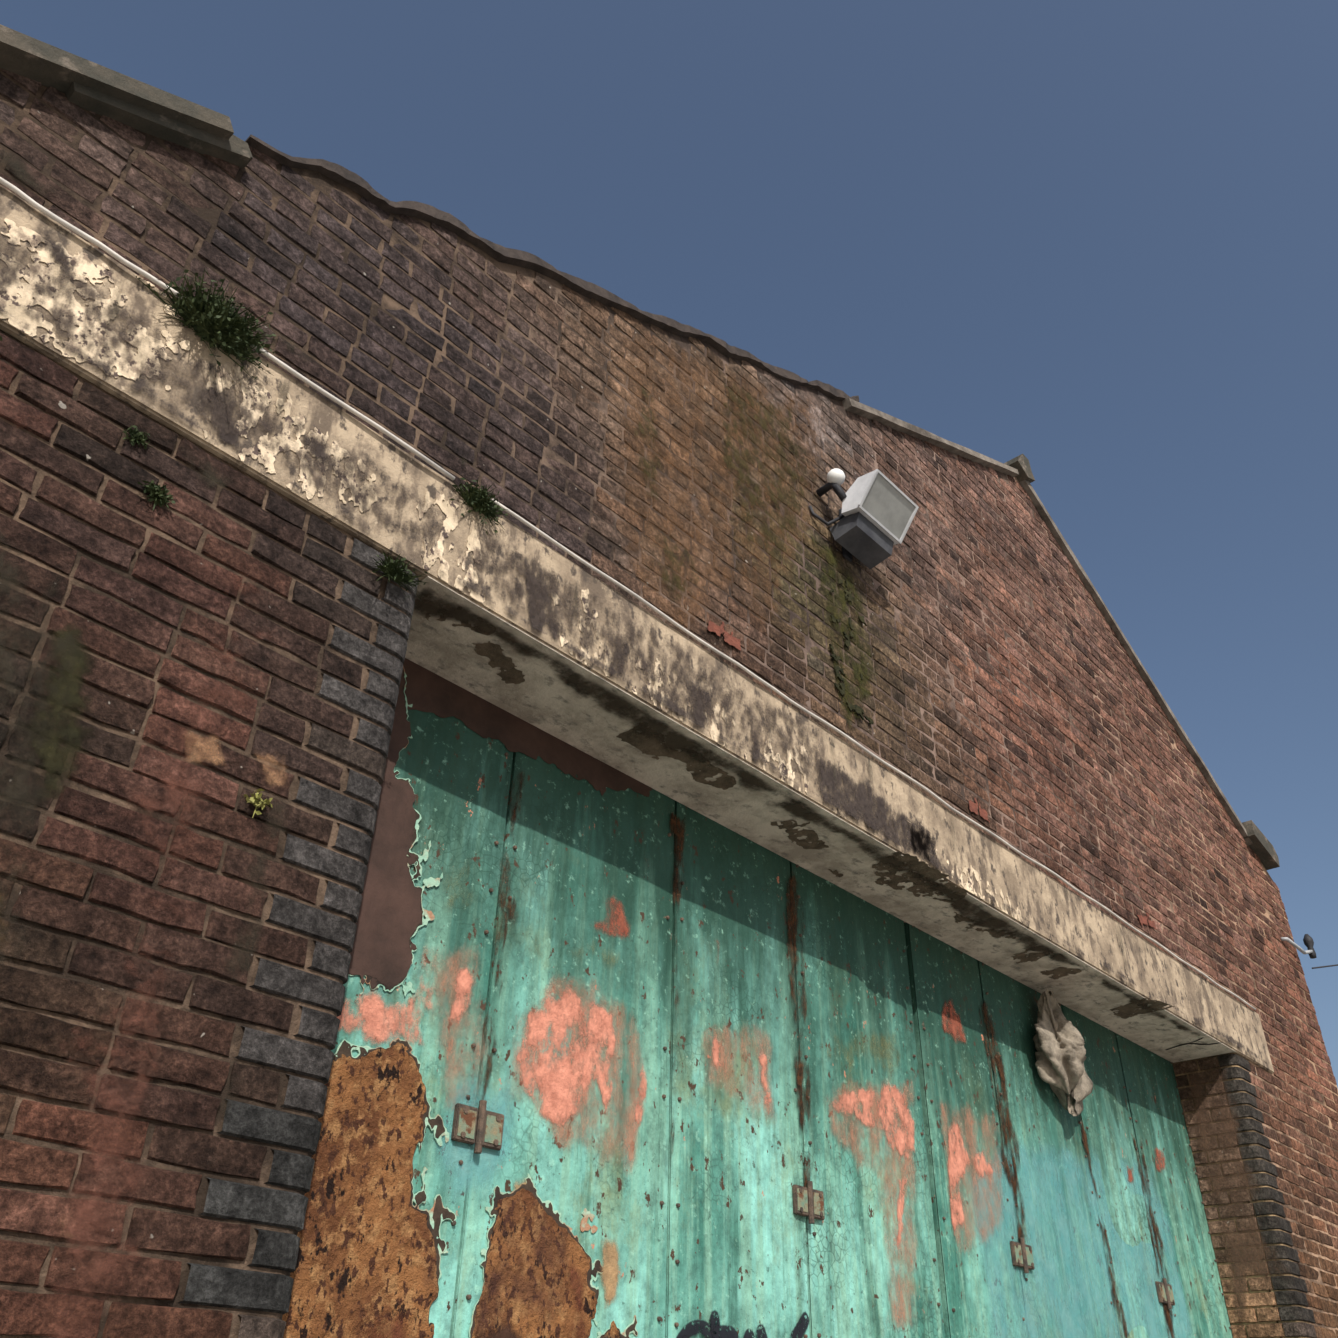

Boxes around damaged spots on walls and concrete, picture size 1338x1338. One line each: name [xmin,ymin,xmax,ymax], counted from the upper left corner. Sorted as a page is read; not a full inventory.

water stain [0,234,436,547]
peeling [337,658,653,1042]
water stain [414,534,1084,966]
rust [282,1038,457,1338]
rust [469,1173,638,1338]
peeling [517,986,647,1161]
peeling [833,1086,914,1263]
rust [979,1000,1026,1243]
water stain [1102,934,1266,1063]